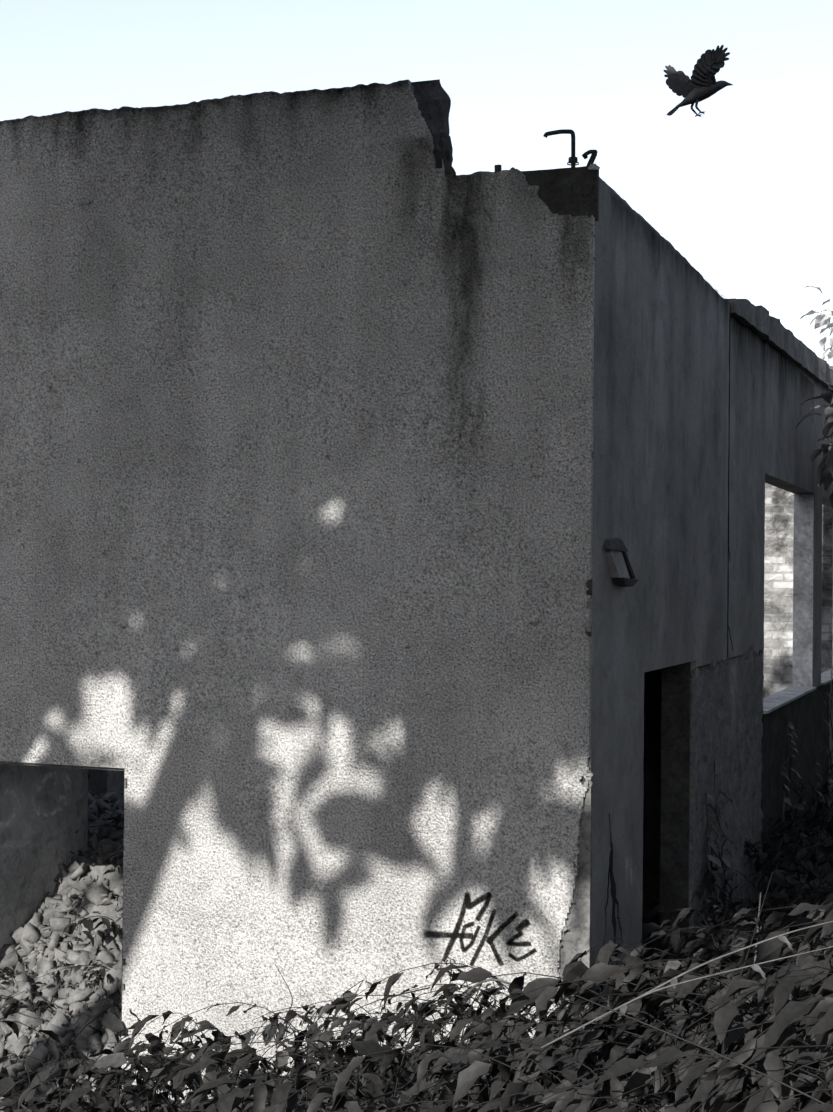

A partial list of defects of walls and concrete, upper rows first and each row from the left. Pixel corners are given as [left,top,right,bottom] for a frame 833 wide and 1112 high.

damp [0,103,189,126]
damp [208,79,408,103]
flaking render [411,79,456,175]
flaking render [520,129,600,221]
flaking render [558,770,594,1034]